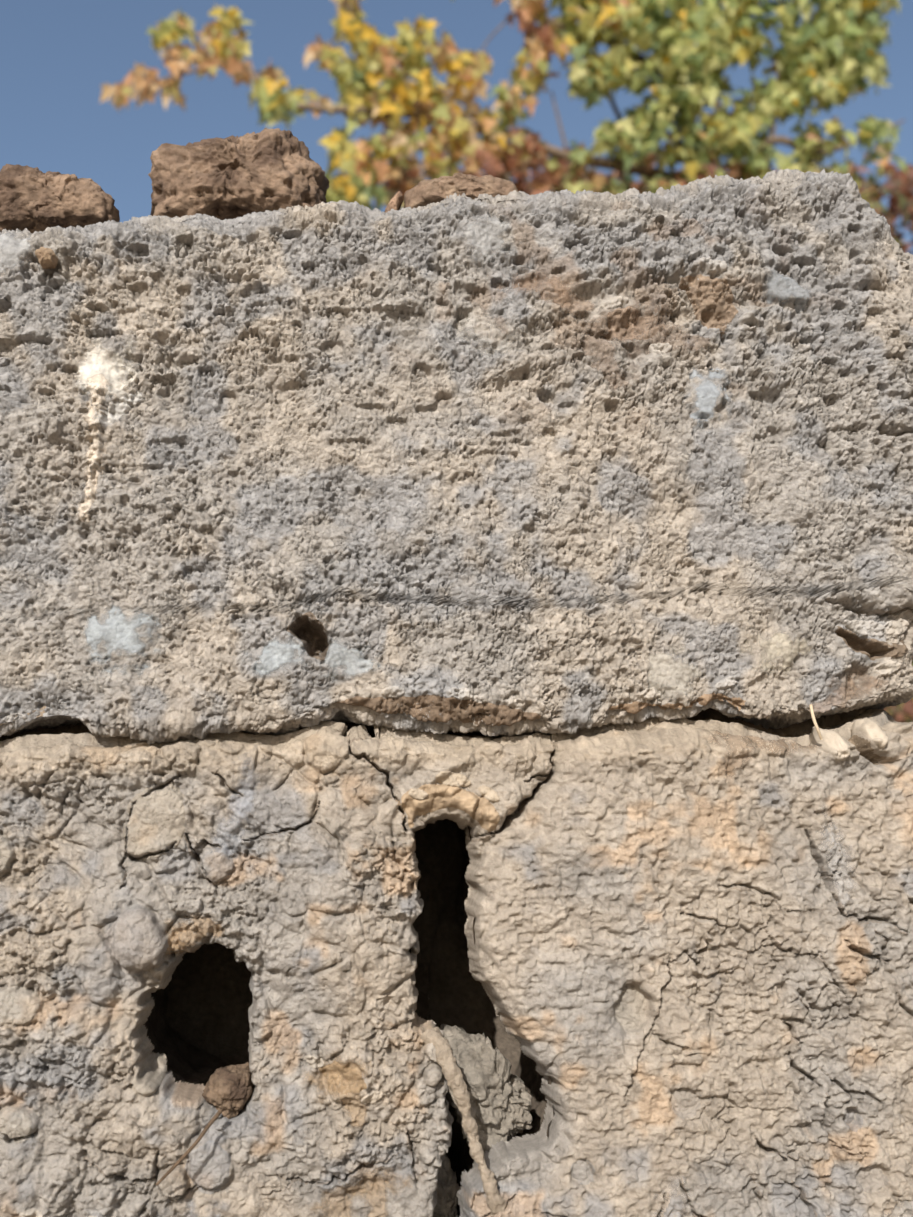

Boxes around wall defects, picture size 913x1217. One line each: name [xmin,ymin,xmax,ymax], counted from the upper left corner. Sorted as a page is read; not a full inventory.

crack [0,722,126,766]
crack [211,771,243,797]
crack [335,722,405,834]
crack [442,730,512,738]
crack [470,742,558,842]
crack [687,708,866,737]
crack [118,776,320,891]
crack [625,829,913,1101]
crack [781,998,882,1159]
crack [657,1177,694,1217]
crack [752,1137,818,1217]